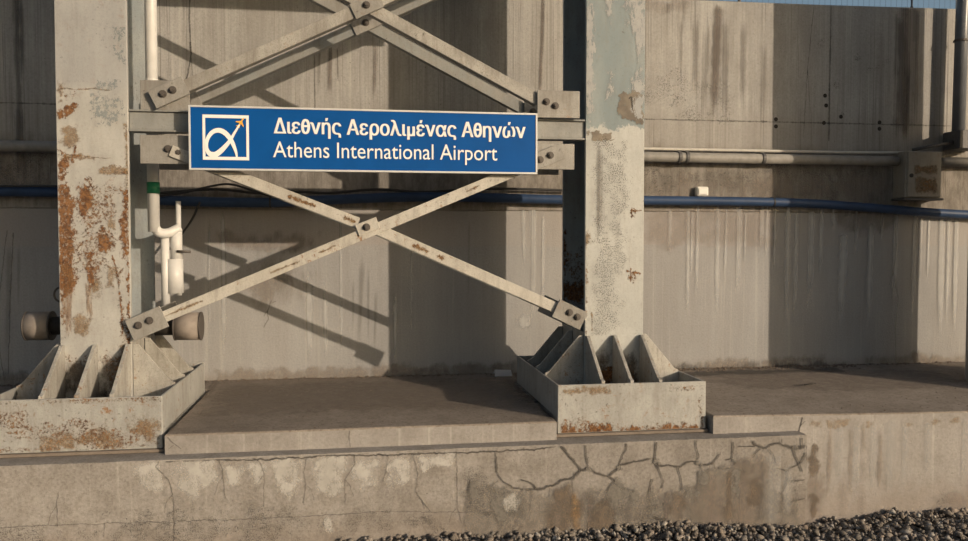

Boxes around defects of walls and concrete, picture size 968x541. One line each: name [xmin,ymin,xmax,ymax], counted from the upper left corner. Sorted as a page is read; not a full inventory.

peeling [586,0,645,142]
damp [713,7,721,103]
rust [33,86,161,404]
rust [563,229,593,333]
damp [645,164,887,308]
damp [912,216,959,312]
rust [0,402,158,452]
crack [166,417,807,507]
rust [561,387,704,433]
damp [808,444,819,476]